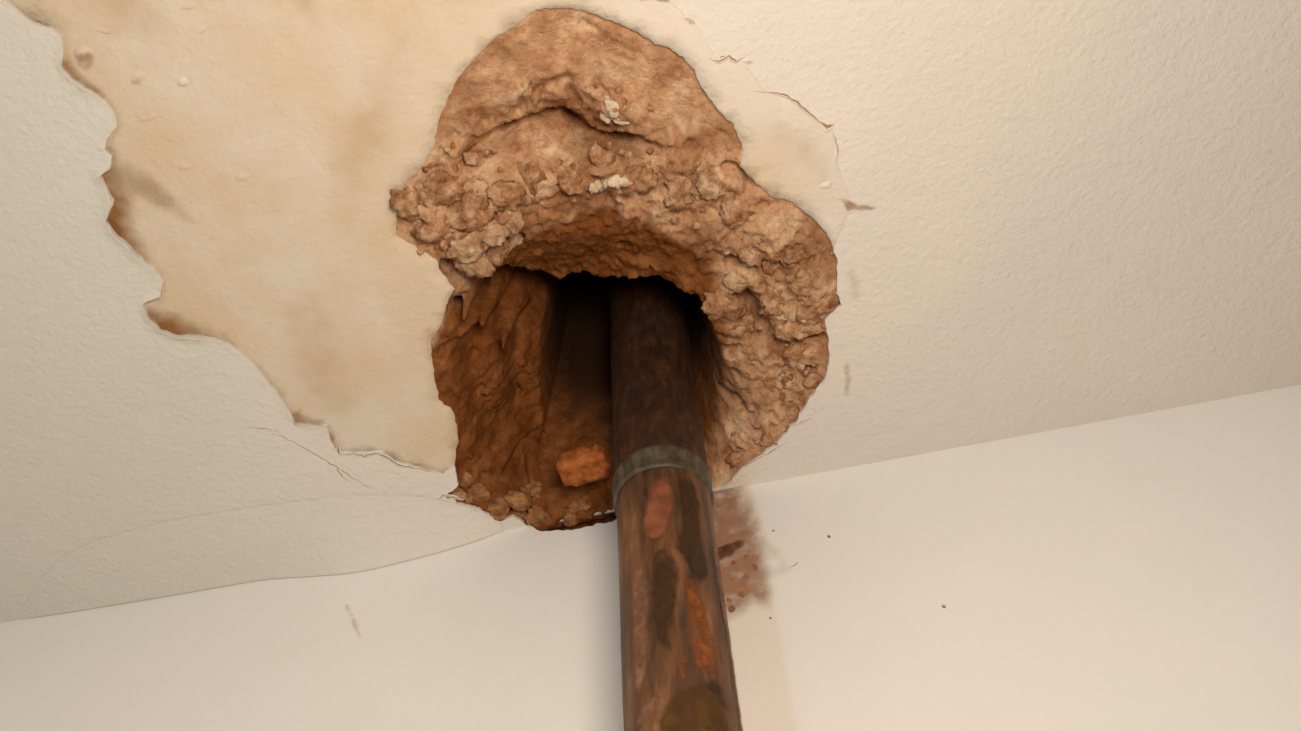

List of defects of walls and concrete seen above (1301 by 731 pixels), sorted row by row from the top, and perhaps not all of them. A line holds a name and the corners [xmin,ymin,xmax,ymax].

crack [710,54,747,64]
crack [759,91,840,158]
peeling [0,0,871,539]